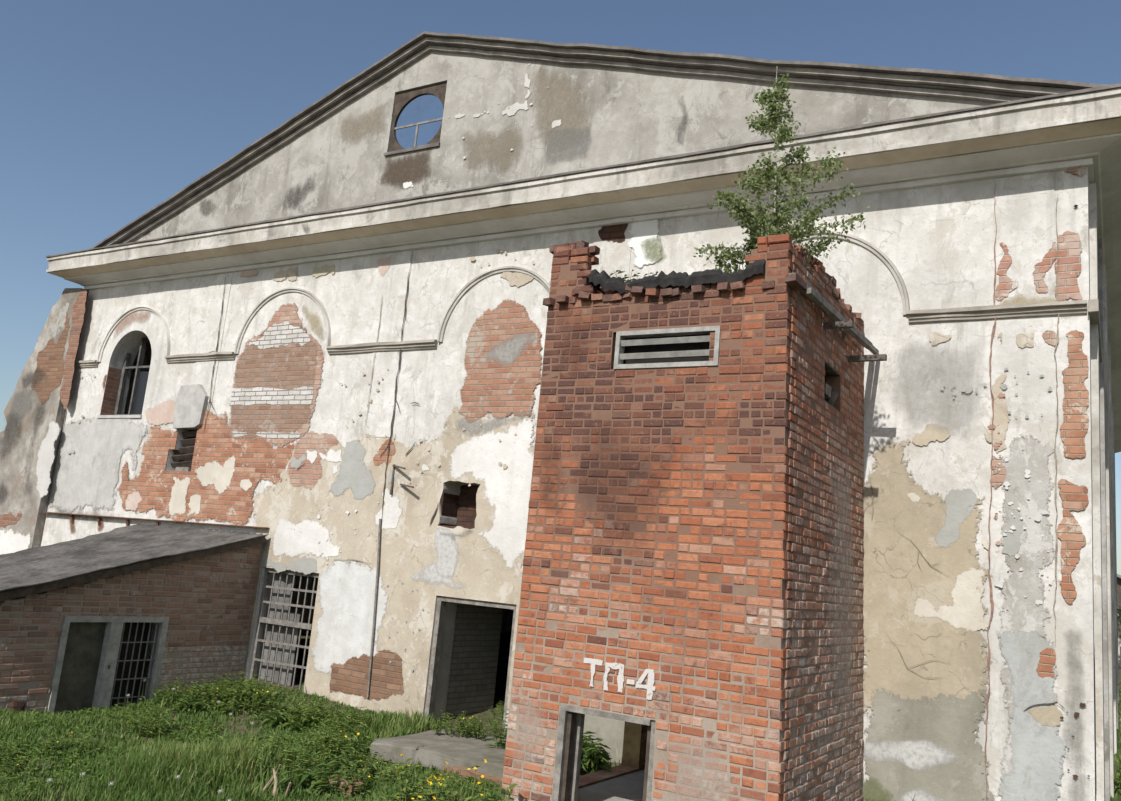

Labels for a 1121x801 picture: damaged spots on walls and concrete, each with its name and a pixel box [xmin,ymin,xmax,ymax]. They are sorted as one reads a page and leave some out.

water stain [381,153,429,186]
water stain [537,71,588,161]
spalling [995,242,1017,301]
spalling [1033,231,1082,301]
spalling [31,290,106,436]
crack [364,262,420,526]
peeling [117,303,536,739]
peeling [863,330,1097,794]